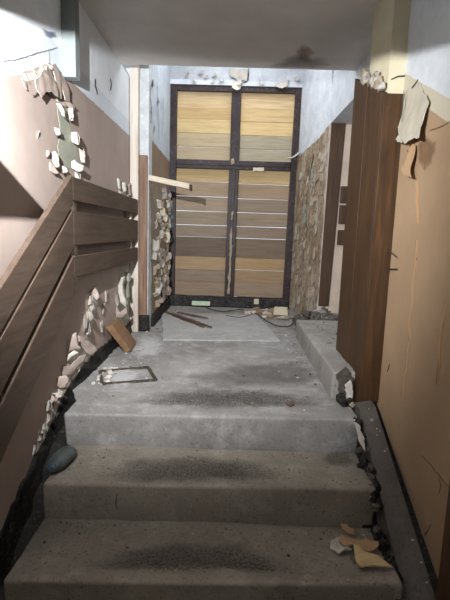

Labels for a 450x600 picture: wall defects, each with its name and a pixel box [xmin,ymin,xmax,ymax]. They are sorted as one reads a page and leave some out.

peeling [21,62,86,179]
peeling [185,68,249,90]
spalling [360,68,386,93]
peeling [395,82,433,178]
peeling [150,174,173,314]
peeling [289,126,329,314]
peeling [115,264,131,323]
peeling [32,286,107,456]
spalling [336,367,355,408]